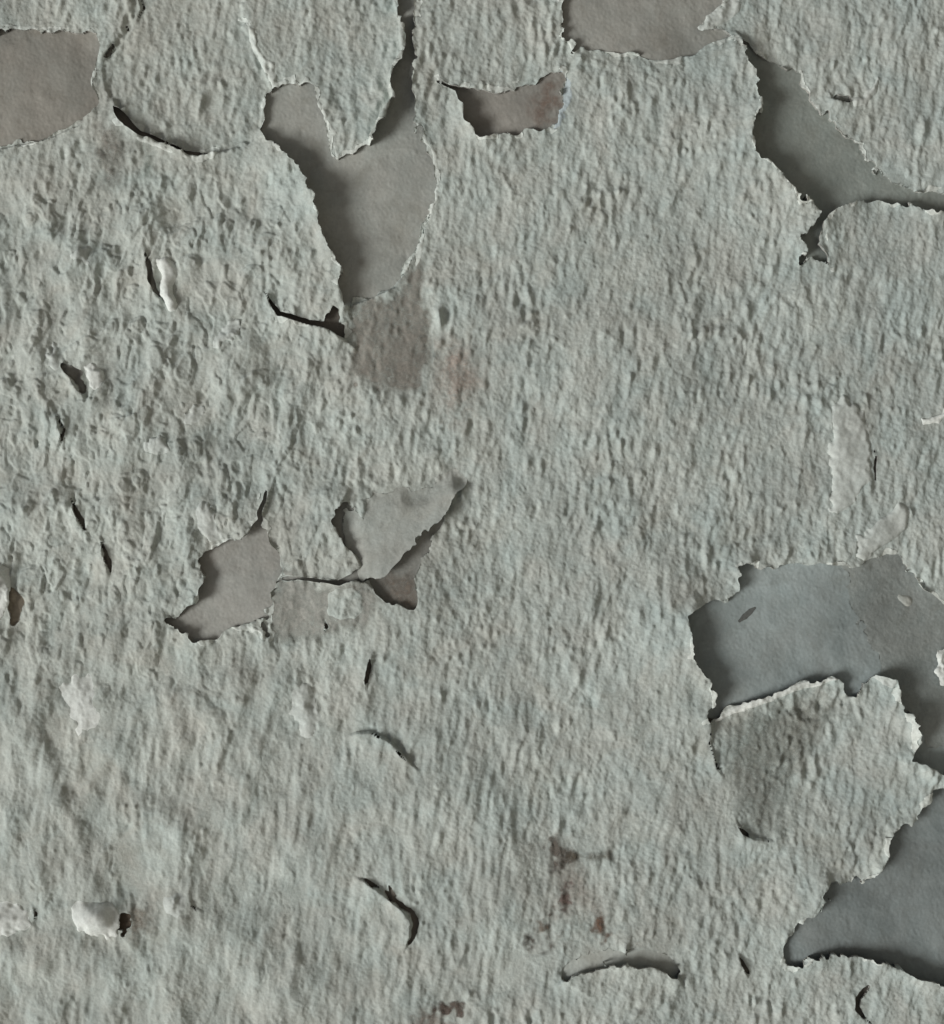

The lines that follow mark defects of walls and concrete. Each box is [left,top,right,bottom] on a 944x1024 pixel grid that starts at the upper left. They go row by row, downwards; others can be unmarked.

peeling [0,24,112,147]
peeling [238,0,572,318]
peeling [551,0,944,272]
peeling [139,253,178,312]
crack [252,292,353,359]
peeling [157,468,467,661]
crack [351,733,414,768]
peeling [652,548,944,1024]
spalling [117,913,131,937]
crack [358,878,419,948]
peeling [561,948,683,1010]